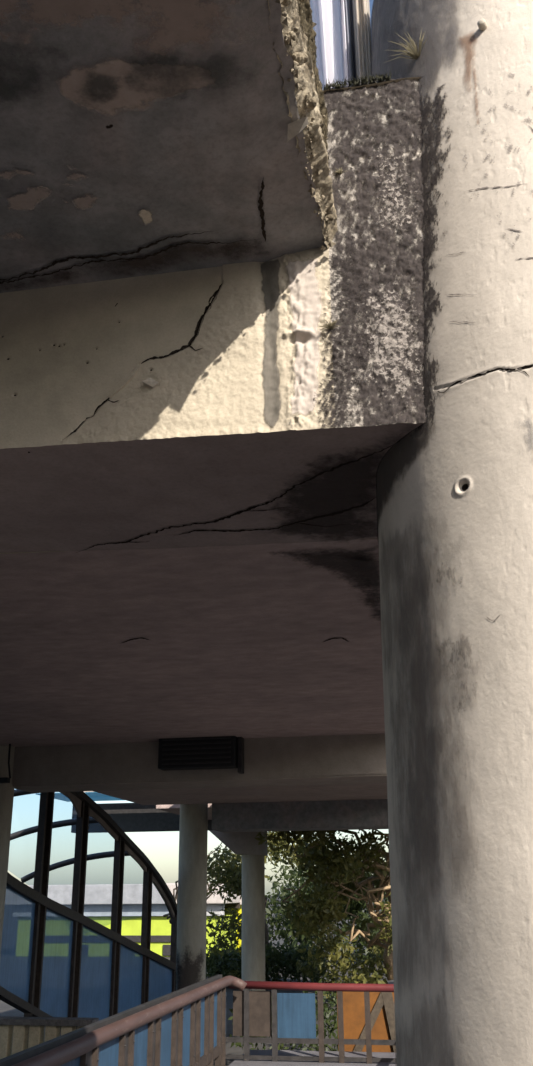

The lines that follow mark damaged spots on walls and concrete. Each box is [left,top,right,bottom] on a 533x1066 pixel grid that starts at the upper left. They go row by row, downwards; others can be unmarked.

leakage [0,0,236,116]
corrosion [460,19,487,79]
leakage [0,231,260,289]
leakage [261,0,458,432]
crack [67,284,222,437]
crack [437,364,533,393]
crack [79,443,396,552]
leakage [286,548,381,618]